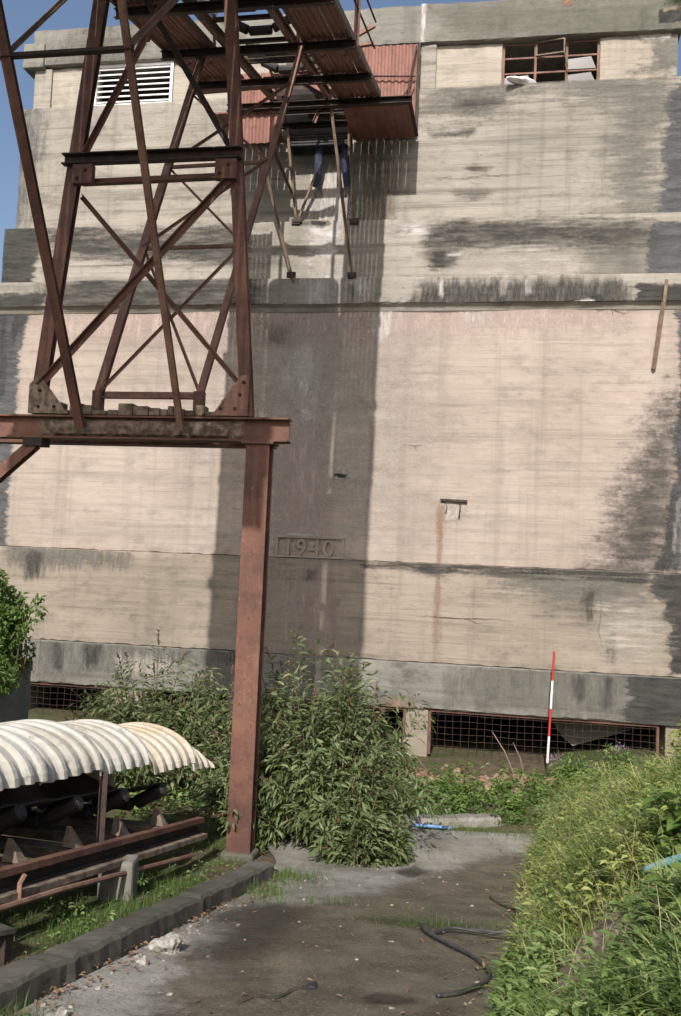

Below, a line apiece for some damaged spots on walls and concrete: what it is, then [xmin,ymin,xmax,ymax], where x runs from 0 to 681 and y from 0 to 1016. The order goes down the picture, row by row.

damp [71,225,234,263]
damp [0,159,57,414]
damp [63,279,236,346]
damp [249,76,681,727]
damp [0,444,14,464]
damp [0,476,130,576]
damp [30,640,236,679]